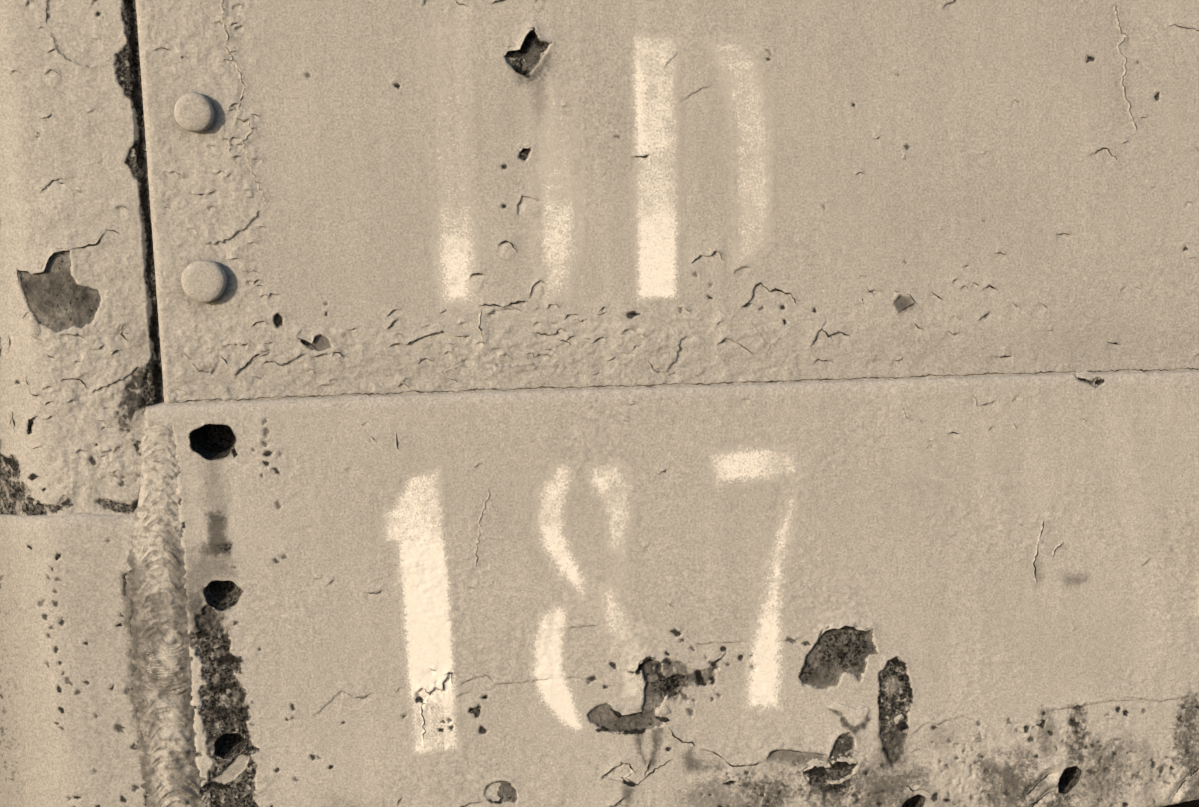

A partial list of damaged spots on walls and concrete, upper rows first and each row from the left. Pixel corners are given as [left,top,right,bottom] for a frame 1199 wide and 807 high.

peeling [500,24,553,77]
crack [1115,8,1137,129]
peeling [17,229,117,340]
crack [386,301,563,375]
crack [716,267,796,354]
peeling [799,617,878,689]
peeling [588,646,753,735]
spalling [199,746,259,794]
crack [667,725,761,767]